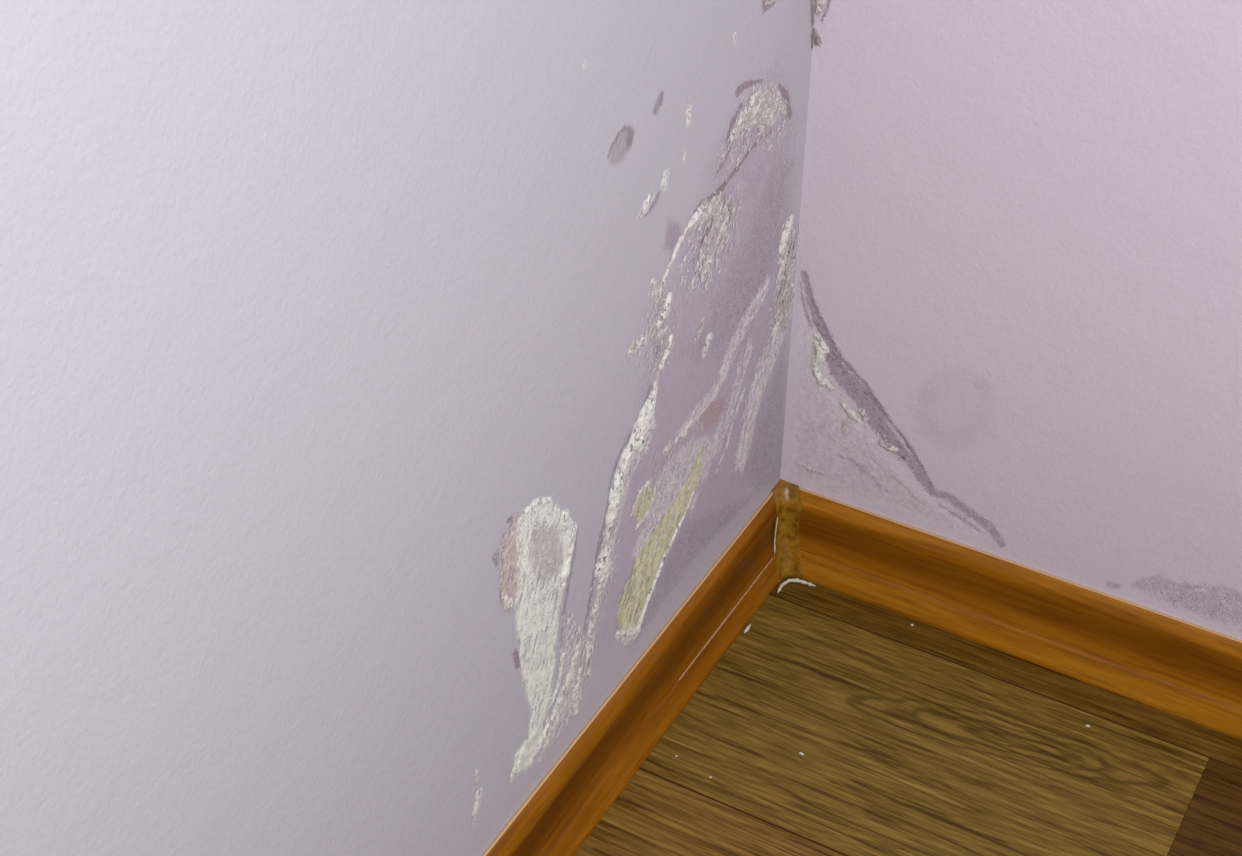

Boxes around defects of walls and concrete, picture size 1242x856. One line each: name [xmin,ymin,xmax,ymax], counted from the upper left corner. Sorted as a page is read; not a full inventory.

peeling [810,0,832,49]
peeling [494,76,1006,783]